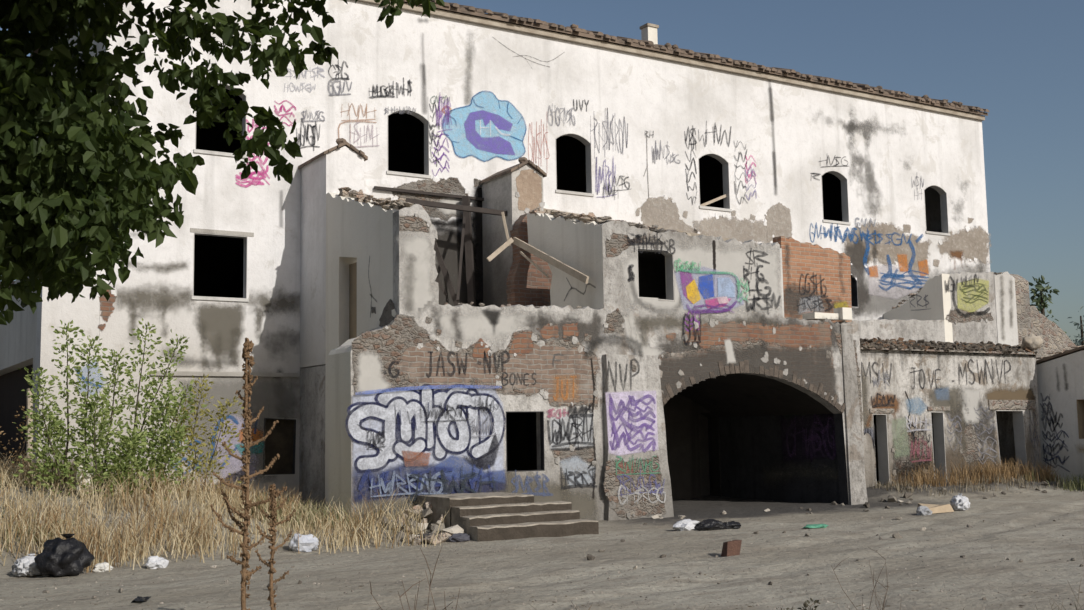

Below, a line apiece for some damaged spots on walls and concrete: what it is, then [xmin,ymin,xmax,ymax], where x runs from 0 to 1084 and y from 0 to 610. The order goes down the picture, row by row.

spalling [515,169,545,214]
damp [843,123,878,207]
spalling [844,218,991,276]
spalling [98,288,117,331]
damp [117,288,299,366]
spalling [352,176,876,486]
spalling [552,444,666,519]